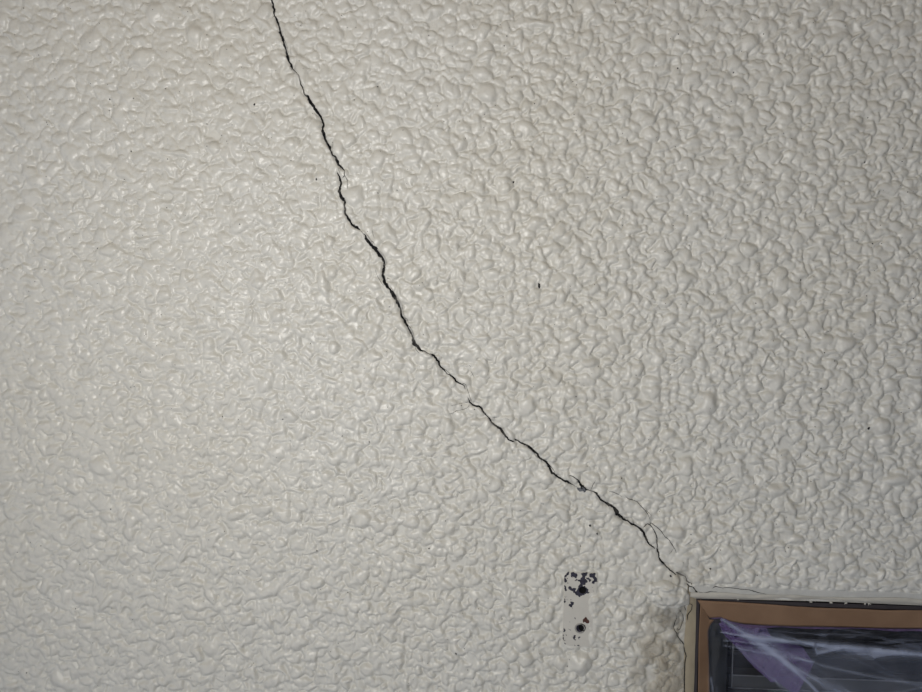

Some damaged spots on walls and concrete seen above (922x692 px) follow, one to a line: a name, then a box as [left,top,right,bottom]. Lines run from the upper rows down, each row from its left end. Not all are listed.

crack [271,0,764,692]